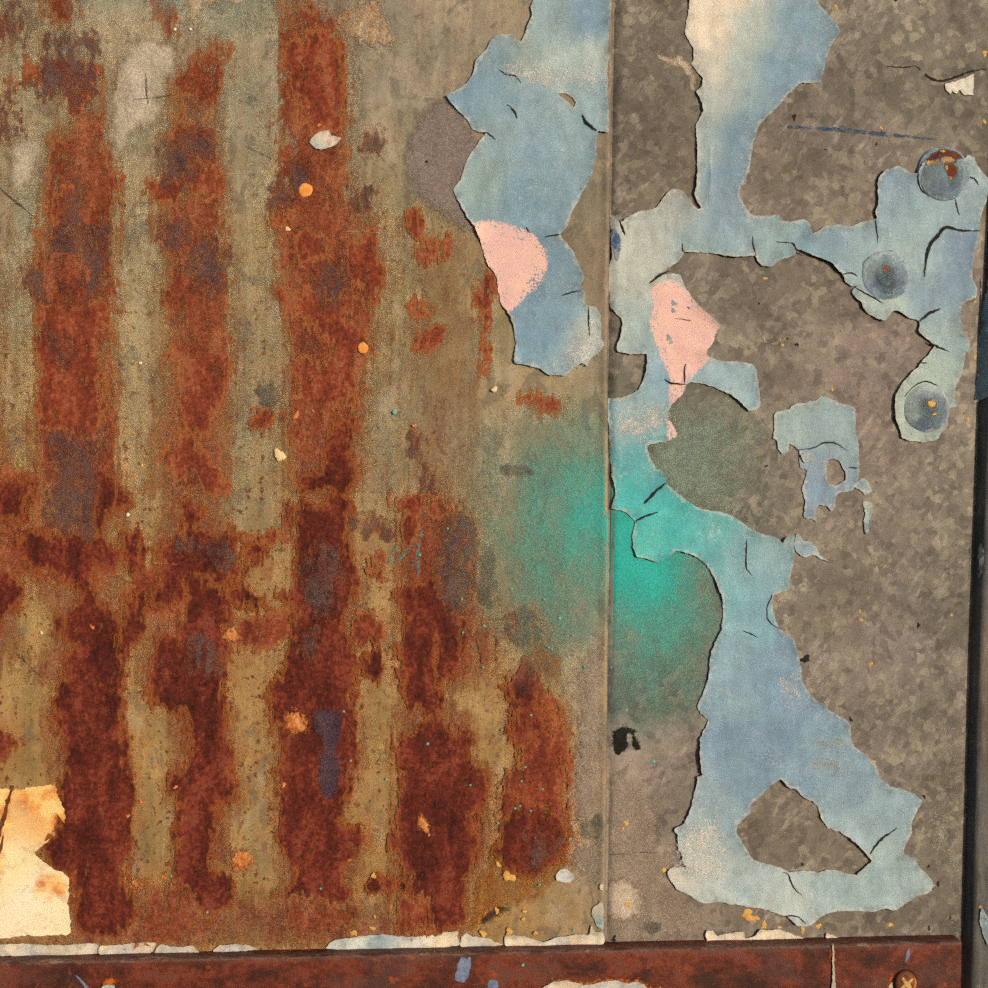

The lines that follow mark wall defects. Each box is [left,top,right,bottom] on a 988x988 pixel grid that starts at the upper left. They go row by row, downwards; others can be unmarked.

peeling [446,0,612,376]
corrosion [0,0,576,952]
peeling [608,0,988,945]
crack [0,785,14,853]
peeling [556,868,574,883]
corrosion [551,977,663,988]